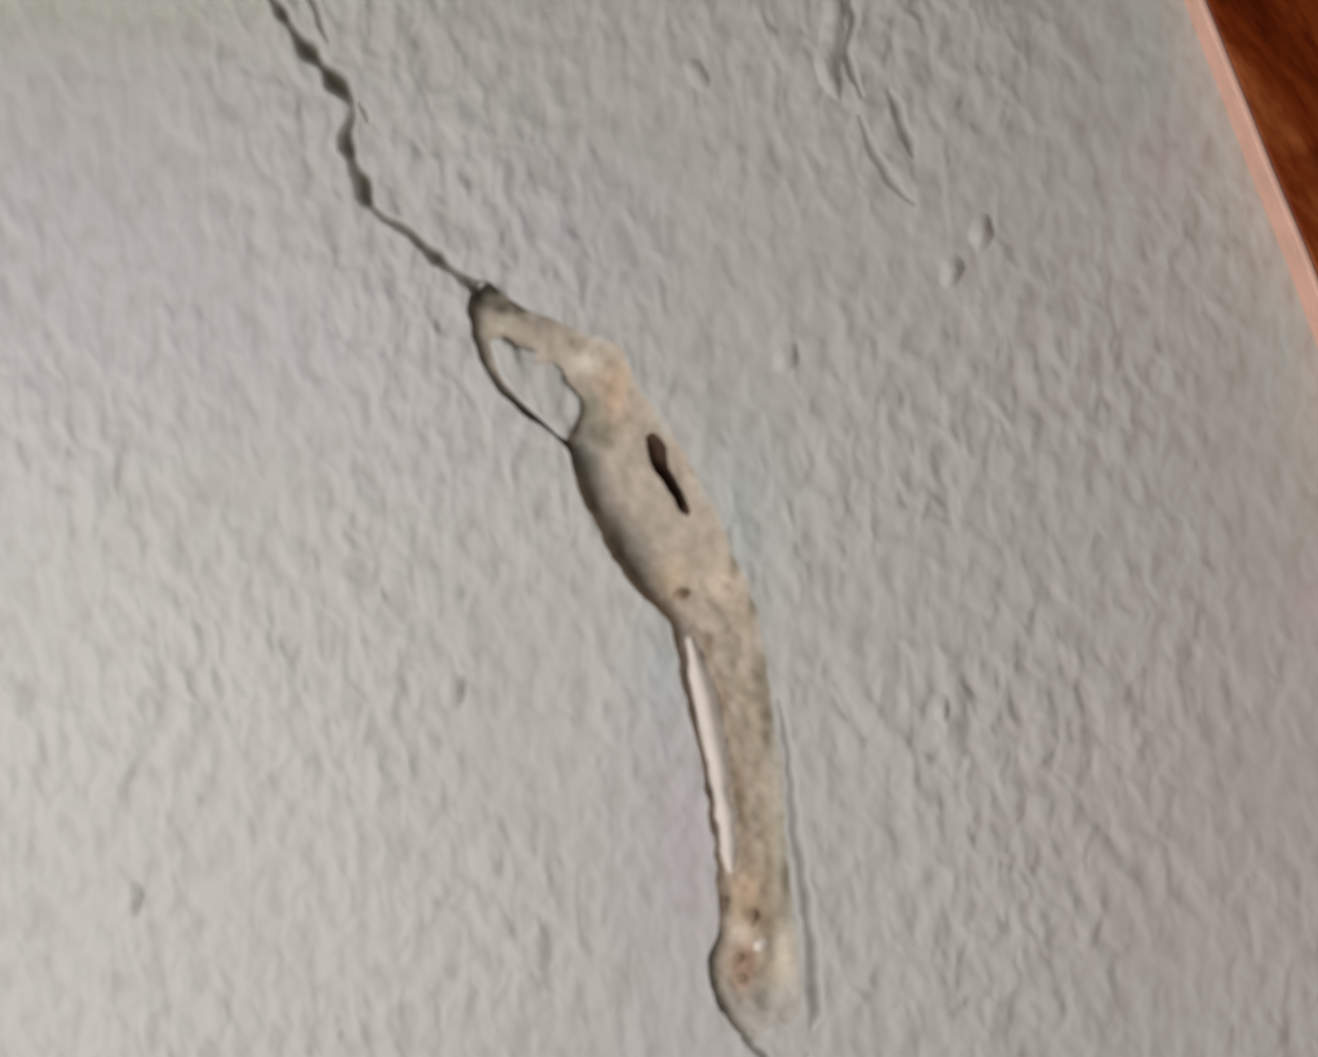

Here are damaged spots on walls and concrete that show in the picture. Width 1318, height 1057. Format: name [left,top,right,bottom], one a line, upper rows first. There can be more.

crack [267,0,484,296]
crack [813,0,919,207]
crack [740,1031,772,1057]